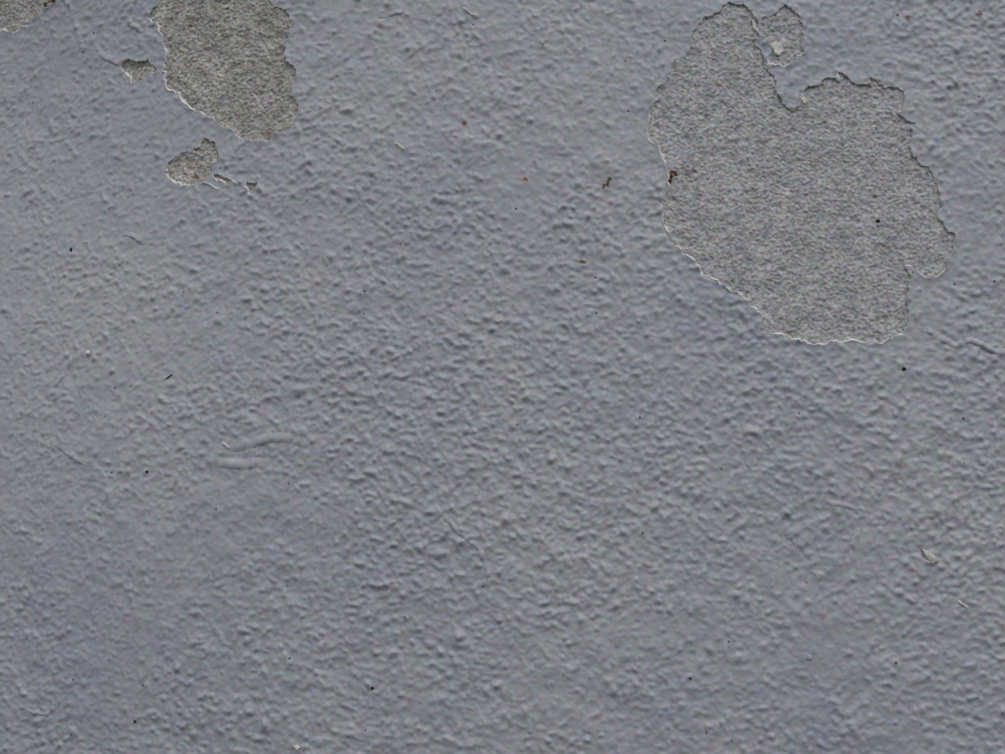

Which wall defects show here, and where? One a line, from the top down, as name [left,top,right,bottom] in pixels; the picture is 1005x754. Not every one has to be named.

peeling [0,0,57,34]
peeling [120,0,299,146]
peeling [164,135,231,187]
peeling [646,1,957,347]